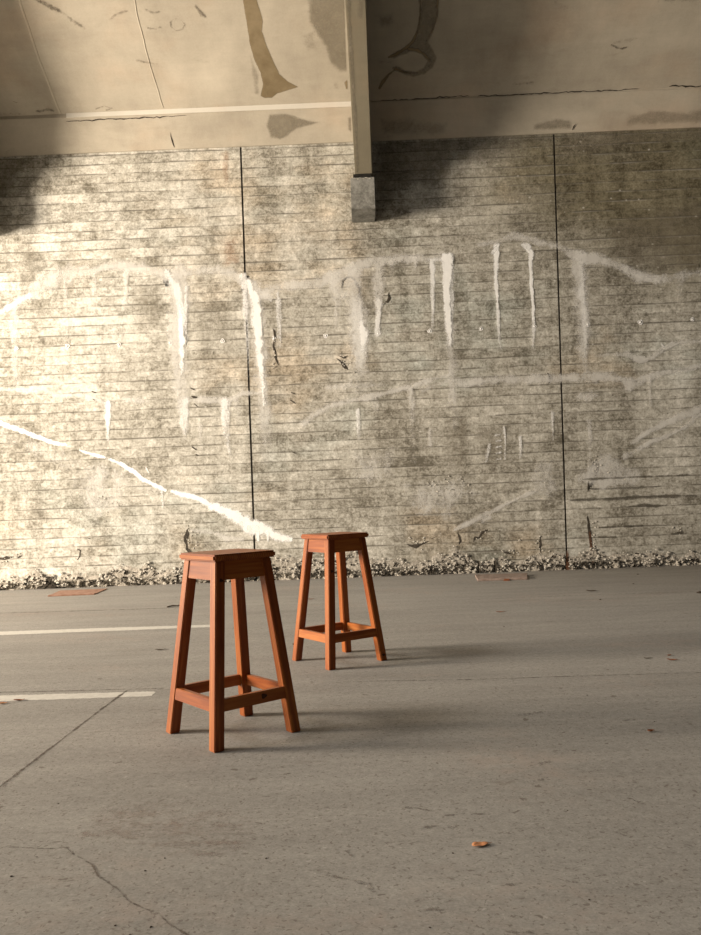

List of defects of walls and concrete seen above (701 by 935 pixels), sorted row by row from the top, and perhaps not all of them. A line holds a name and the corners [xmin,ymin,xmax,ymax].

damp [243,0,297,98]
damp [311,0,357,137]
damp [379,0,438,89]
damp [268,115,311,138]
damp [0,253,454,450]
damp [483,242,500,338]
damp [513,235,556,345]
damp [446,365,700,395]
damp [567,251,666,357]
crack [182,525,199,553]
crack [38,847,188,935]